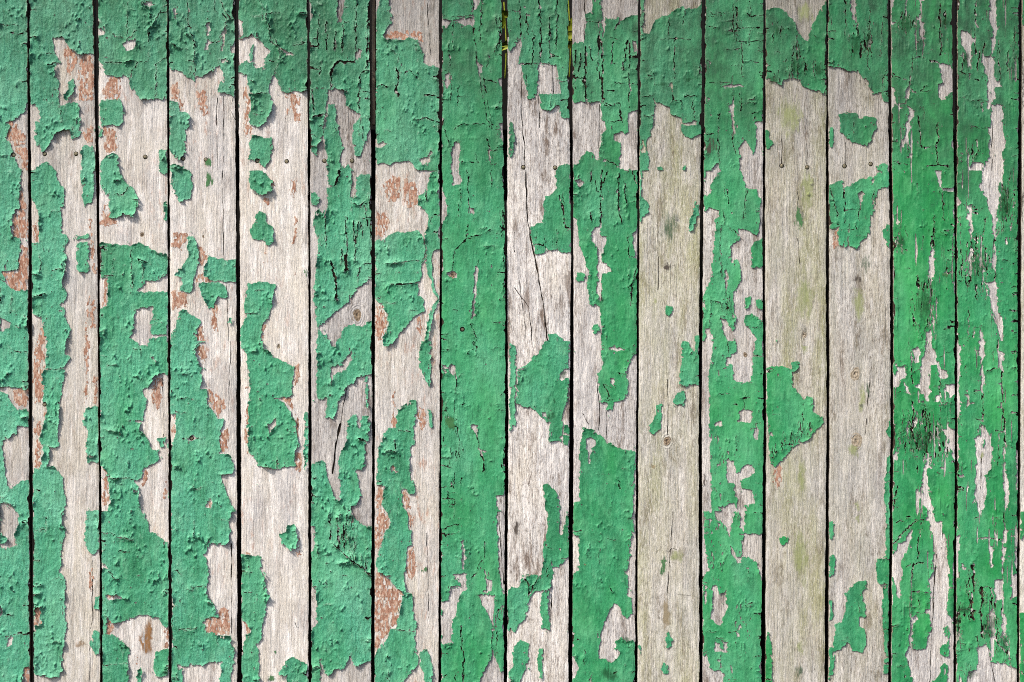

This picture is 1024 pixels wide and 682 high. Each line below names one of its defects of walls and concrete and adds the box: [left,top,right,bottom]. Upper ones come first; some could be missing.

peeling [0,0,238,682]
crack [266,0,763,340]
peeling [238,0,1024,682]
crack [856,8,942,91]
crack [899,116,947,166]
crack [930,126,1018,540]